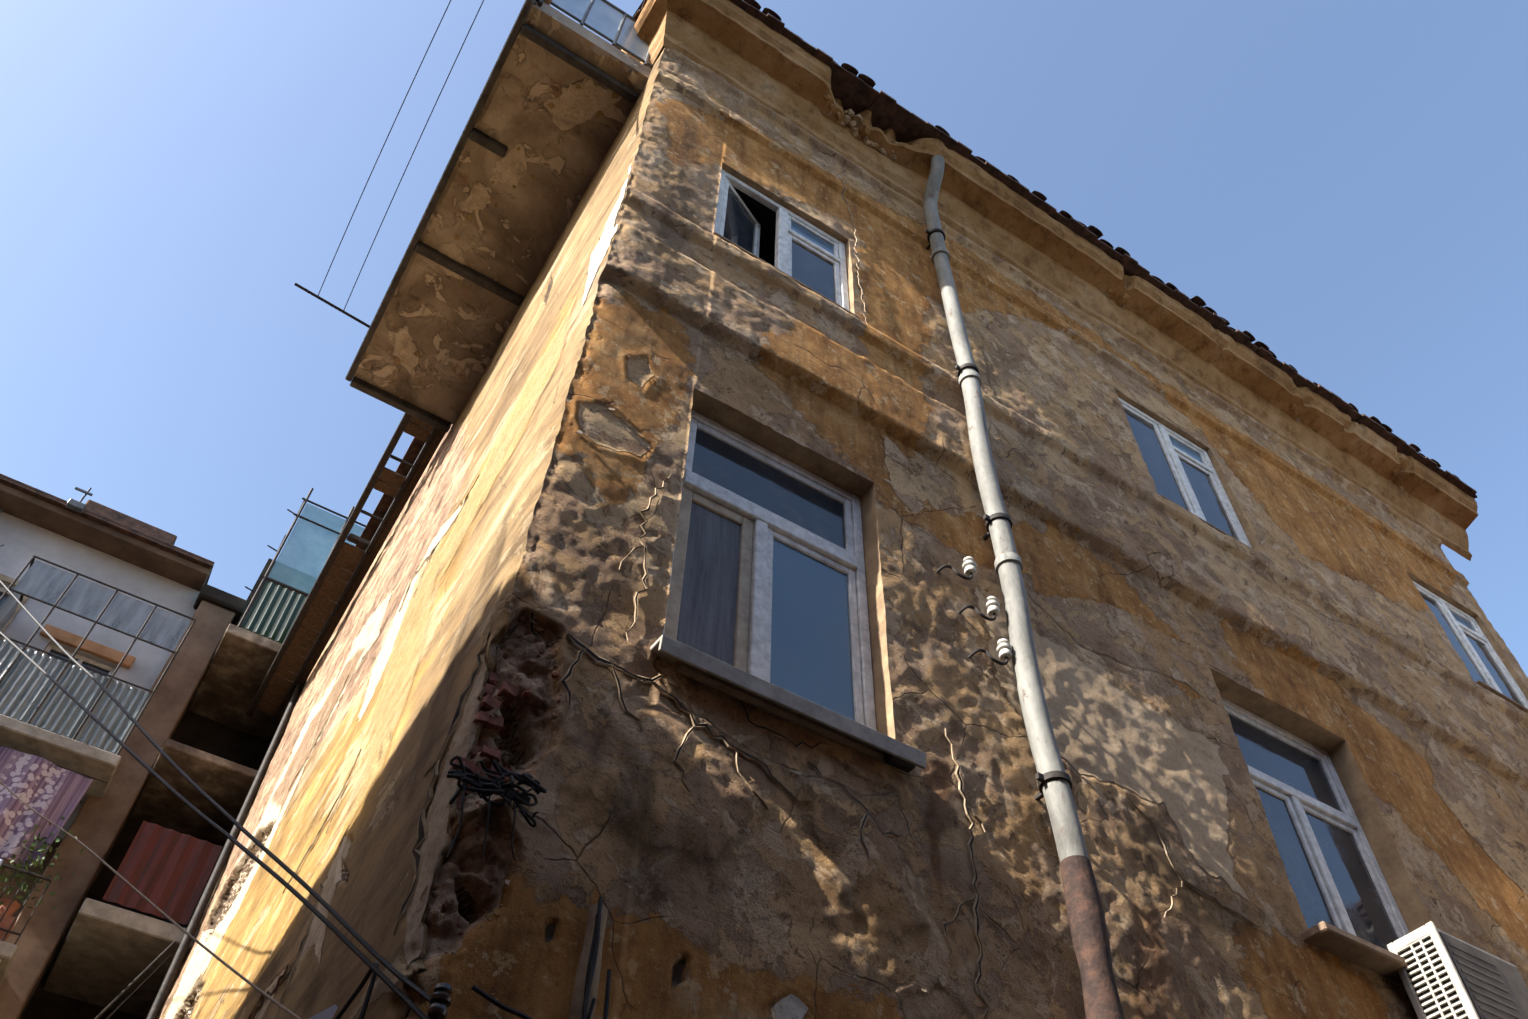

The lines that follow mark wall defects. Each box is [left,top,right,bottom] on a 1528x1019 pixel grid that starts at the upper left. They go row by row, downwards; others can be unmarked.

peeling [582,163,632,305]
peeling [165,497,468,1019]
flaking render [403,615,561,968]
crack [393,473,904,936]
peeling [771,994,808,1019]
crack [942,728,990,1019]